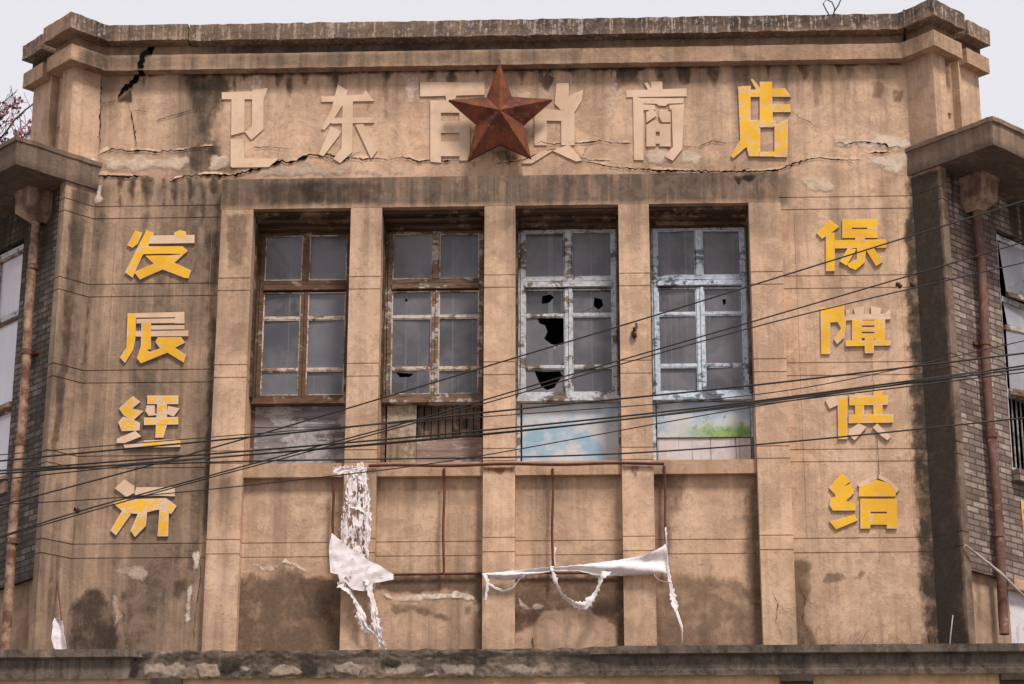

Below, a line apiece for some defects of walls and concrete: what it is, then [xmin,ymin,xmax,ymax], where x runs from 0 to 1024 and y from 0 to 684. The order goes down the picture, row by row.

crack [98,46,459,182]
peeling [103,155,189,172]
peeling [209,155,229,171]
crack [492,112,910,173]
peeling [834,134,911,174]
damp [118,177,152,196]
damp [172,178,217,212]
damp [71,589,124,649]